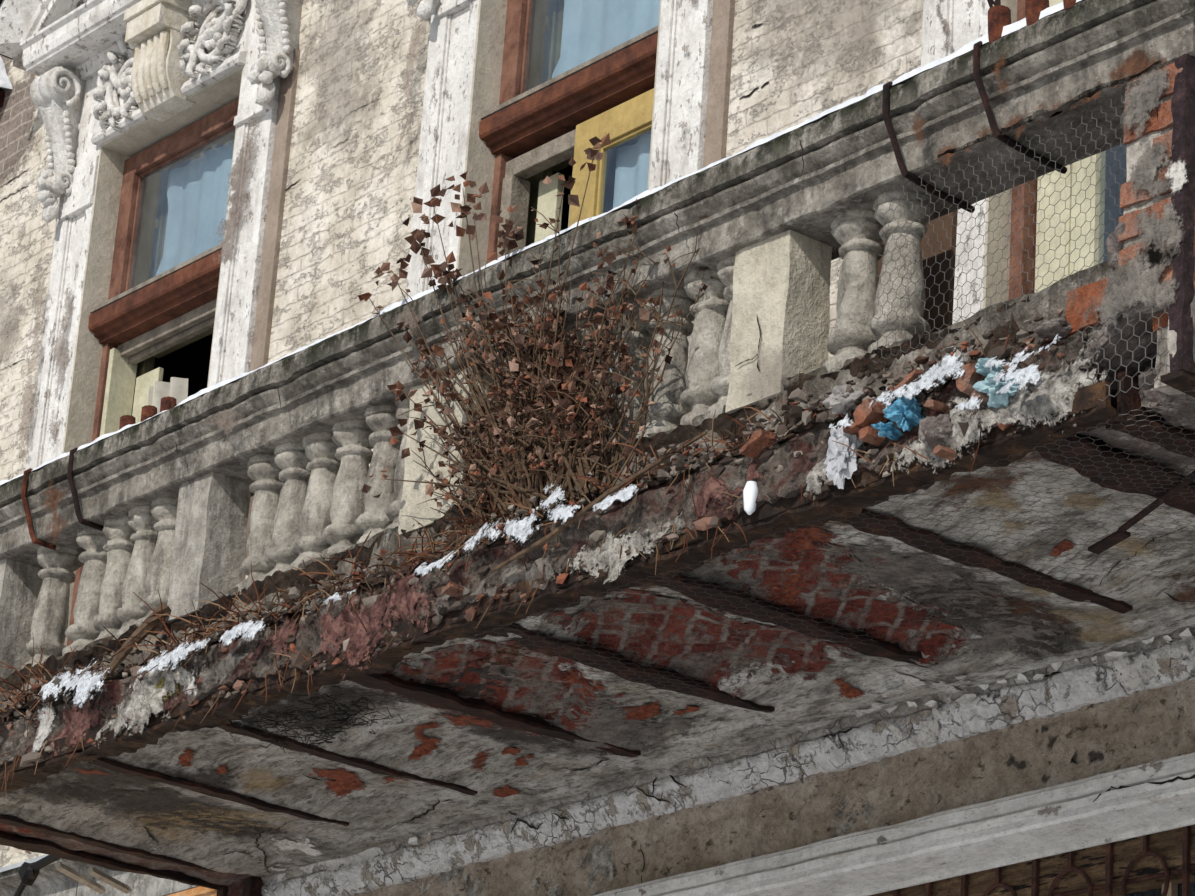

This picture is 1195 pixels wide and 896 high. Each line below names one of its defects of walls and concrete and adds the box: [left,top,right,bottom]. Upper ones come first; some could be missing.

spalling [534,458,1193,751]
spalling [50,614,298,761]
spalling [308,556,700,798]
crack [818,727,859,747]
spalling [178,748,195,769]
crack [562,759,609,771]
spalling [1070,751,1104,763]
crack [636,775,687,803]
crack [1093,774,1195,802]
crack [389,795,453,828]
crack [508,811,569,834]
spalling [0,823,45,854]